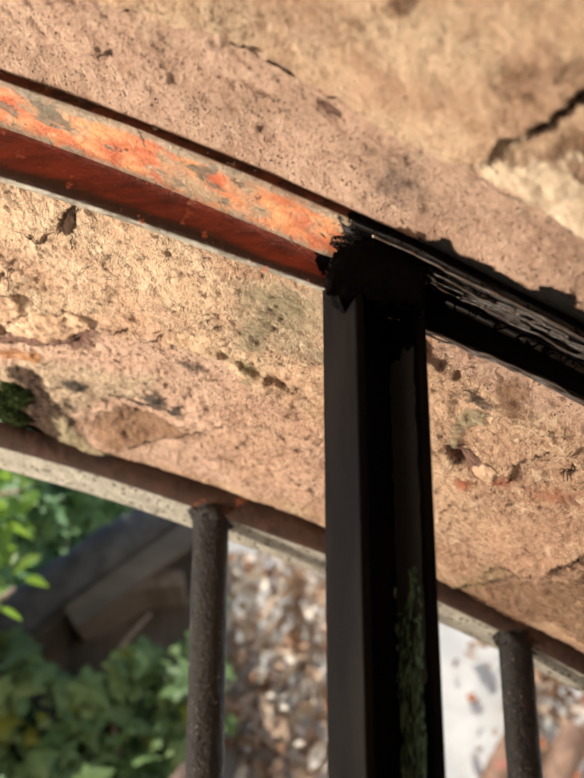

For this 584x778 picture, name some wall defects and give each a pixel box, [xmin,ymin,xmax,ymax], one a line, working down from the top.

crack [461,89,584,215]
peeling [477,136,584,239]
crack [15,206,76,250]
crack [0,259,18,292]
crack [93,322,165,344]